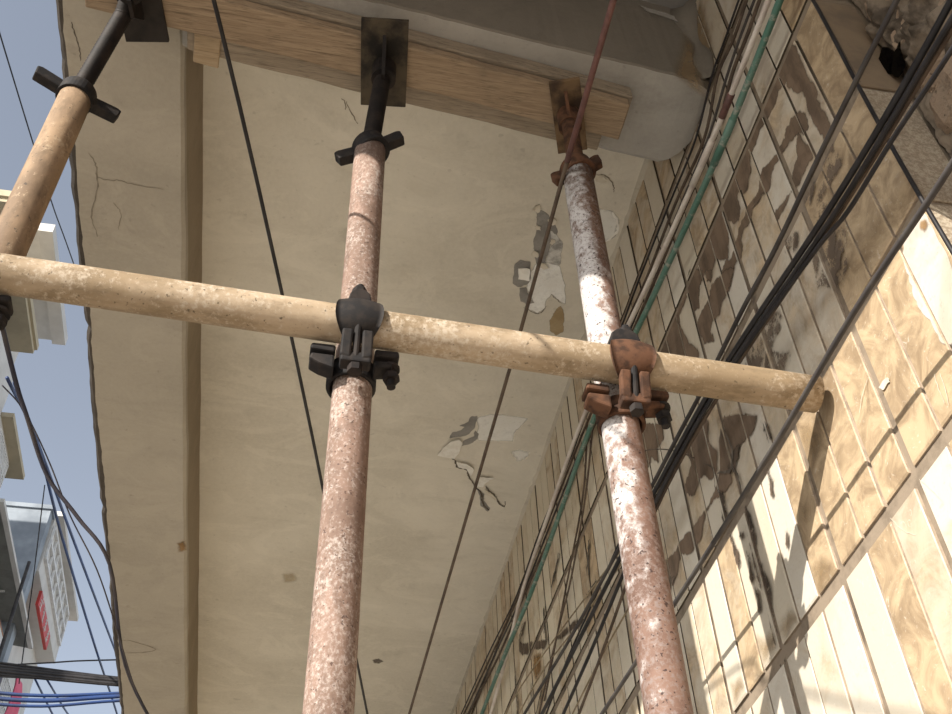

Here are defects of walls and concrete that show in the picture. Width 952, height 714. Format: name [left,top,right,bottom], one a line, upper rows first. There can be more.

crack [89,154,160,237]
leakage [661,45,847,358]
peeling [513,205,566,335]
leakage [745,313,788,371]
peeling [438,414,529,511]
leakage [642,423,664,467]
leakage [805,431,817,455]
leakage [665,413,794,659]